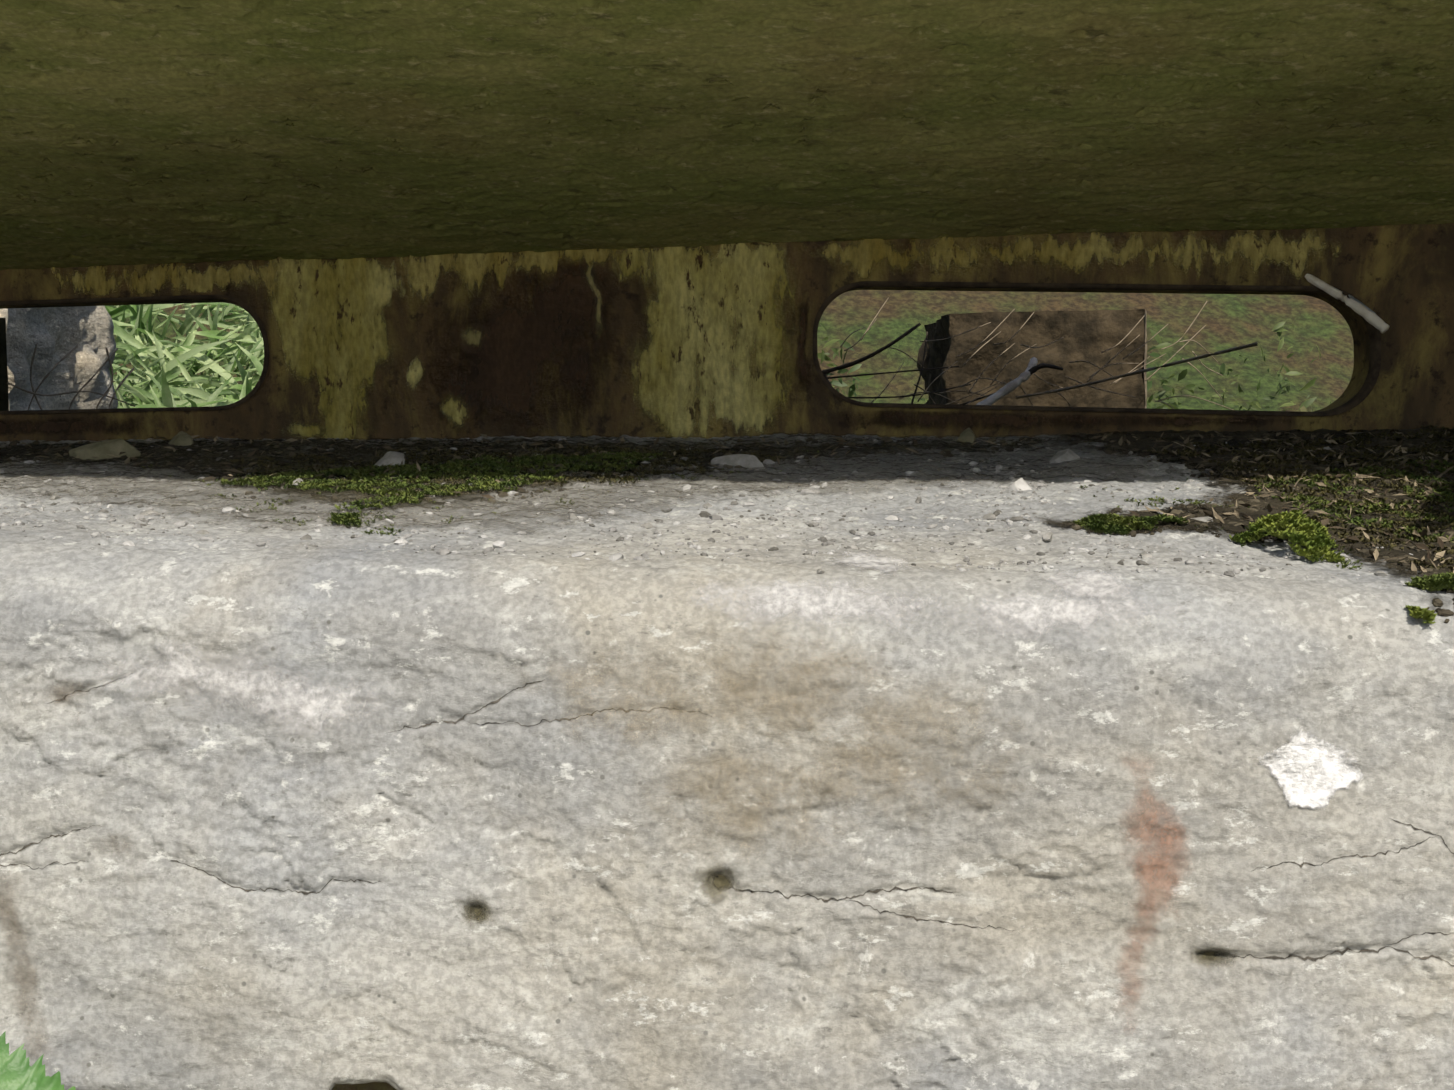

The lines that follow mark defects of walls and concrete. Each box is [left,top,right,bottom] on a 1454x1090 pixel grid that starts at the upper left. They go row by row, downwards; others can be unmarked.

rust [428,257,609,437]
rust [0,417,137,435]
rust [847,411,1272,429]
crack [50,671,137,703]
crack [398,680,703,731]
crack [0,825,102,870]
crack [157,852,377,895]
rust [1131,807,1183,901]
crack [1253,819,1454,871]
crack [724,886,1014,931]
crack [1229,932,1454,966]